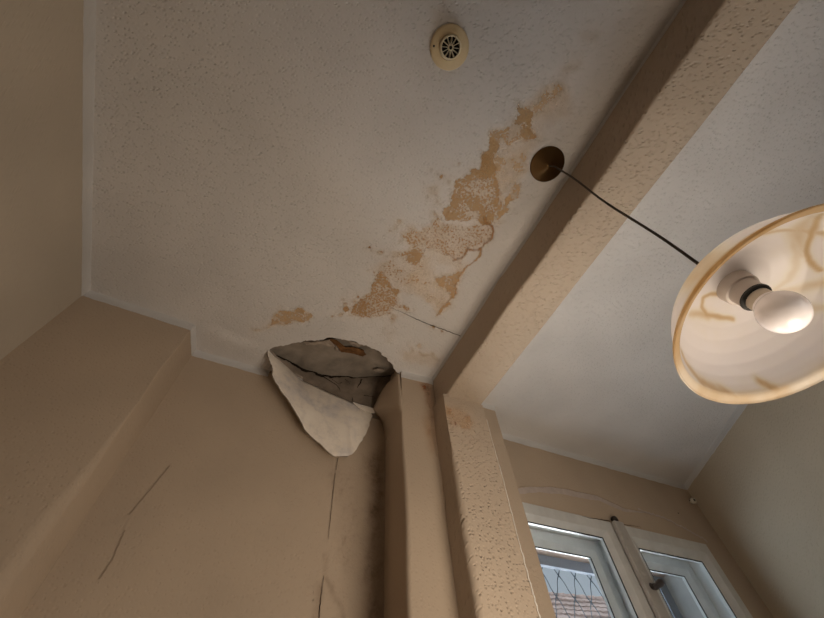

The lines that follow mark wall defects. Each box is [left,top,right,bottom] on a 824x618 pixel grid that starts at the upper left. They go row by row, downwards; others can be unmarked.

damp [343,85,562,318]
flaking render [278,357,391,420]